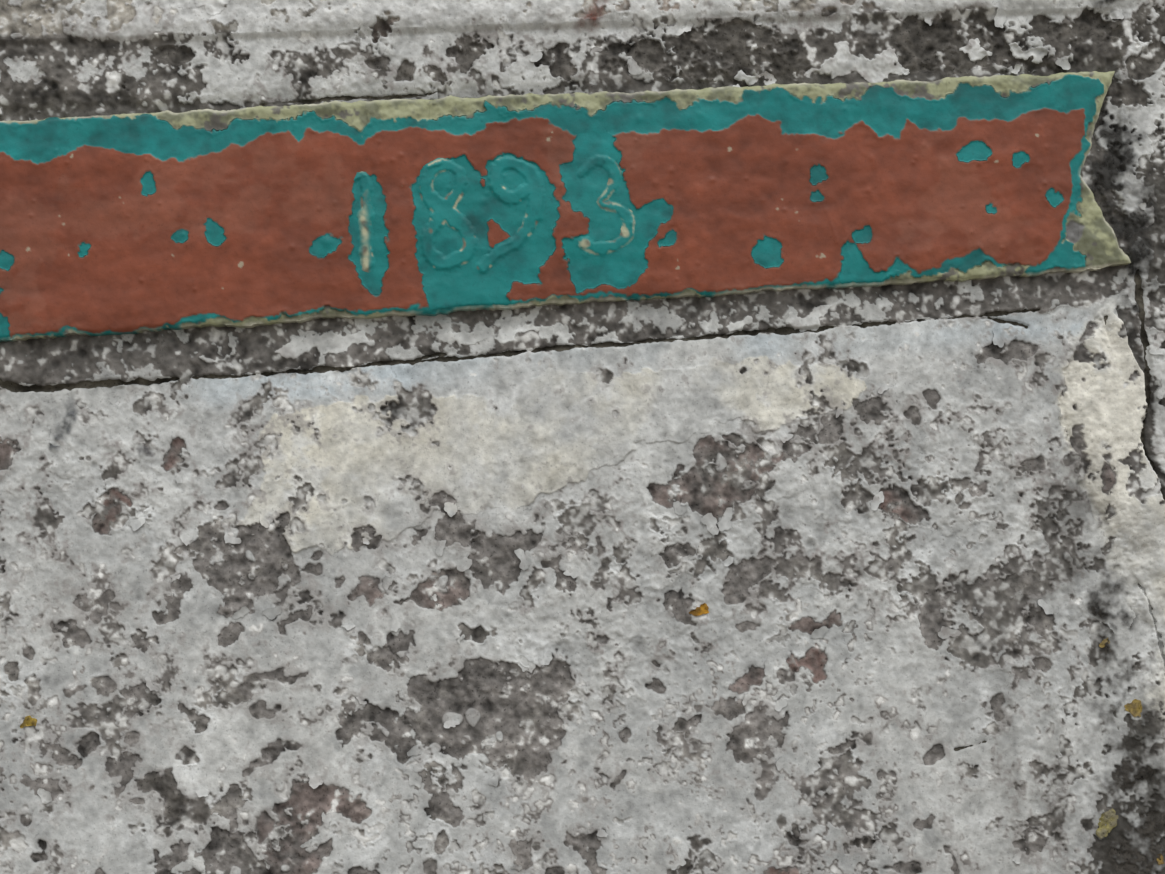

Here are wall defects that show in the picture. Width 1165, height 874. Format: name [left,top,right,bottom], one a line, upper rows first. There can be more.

flaking render [365,21,494,85]
peeling [412,8,1125,311]
crack [0,308,1040,392]
crack [1134,269,1165,500]
peeling [1145,331,1165,406]
peeling [63,676,372,874]
peeling [131,501,322,653]
peeling [341,622,416,672]
peeling [336,650,575,874]
peeling [335,491,589,611]
peeling [653,610,843,771]
peeling [647,384,940,605]